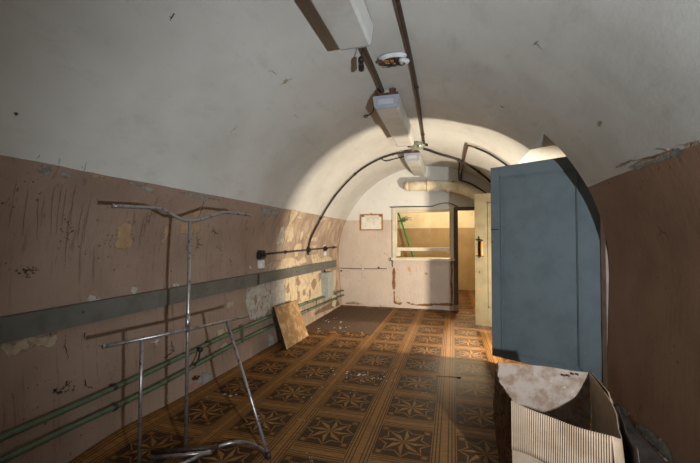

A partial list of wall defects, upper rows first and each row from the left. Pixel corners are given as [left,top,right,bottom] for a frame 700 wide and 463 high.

peeling [245,209,332,320]
peeling [1,332,58,357]